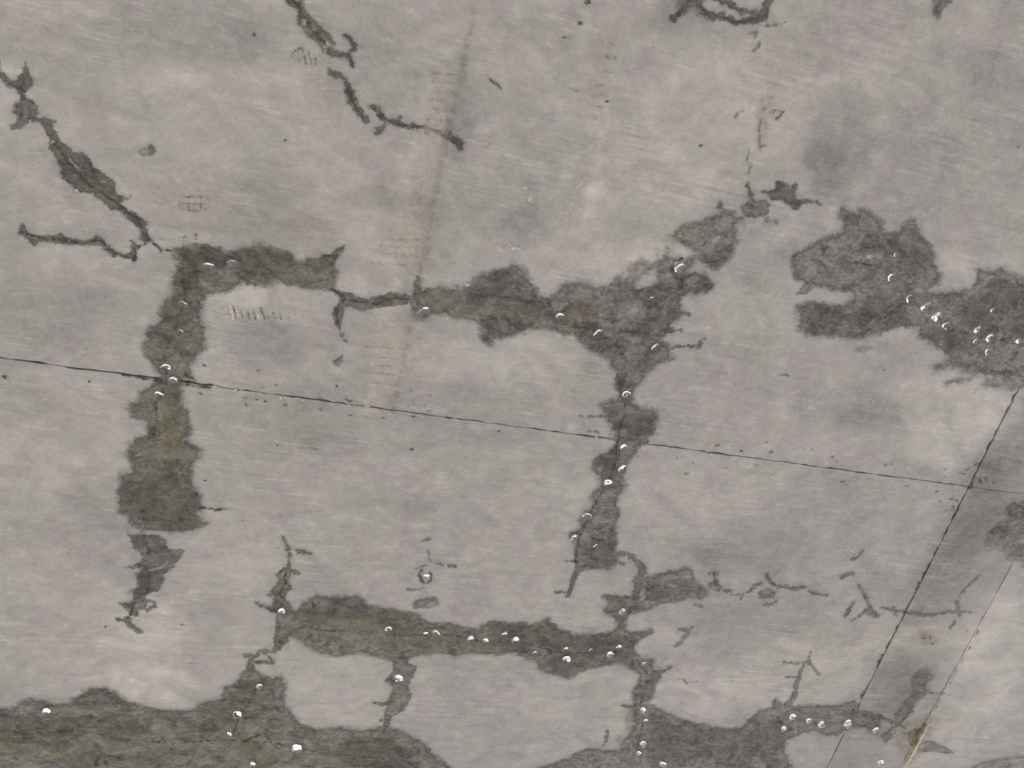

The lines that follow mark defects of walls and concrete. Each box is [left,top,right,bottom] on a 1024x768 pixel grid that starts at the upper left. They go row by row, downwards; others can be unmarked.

crack [0,62,172,261]
crack [285,0,463,151]
crack [669,0,777,52]
leakage [791,207,1024,390]
leakage [0,181,945,768]
crack [707,549,972,629]